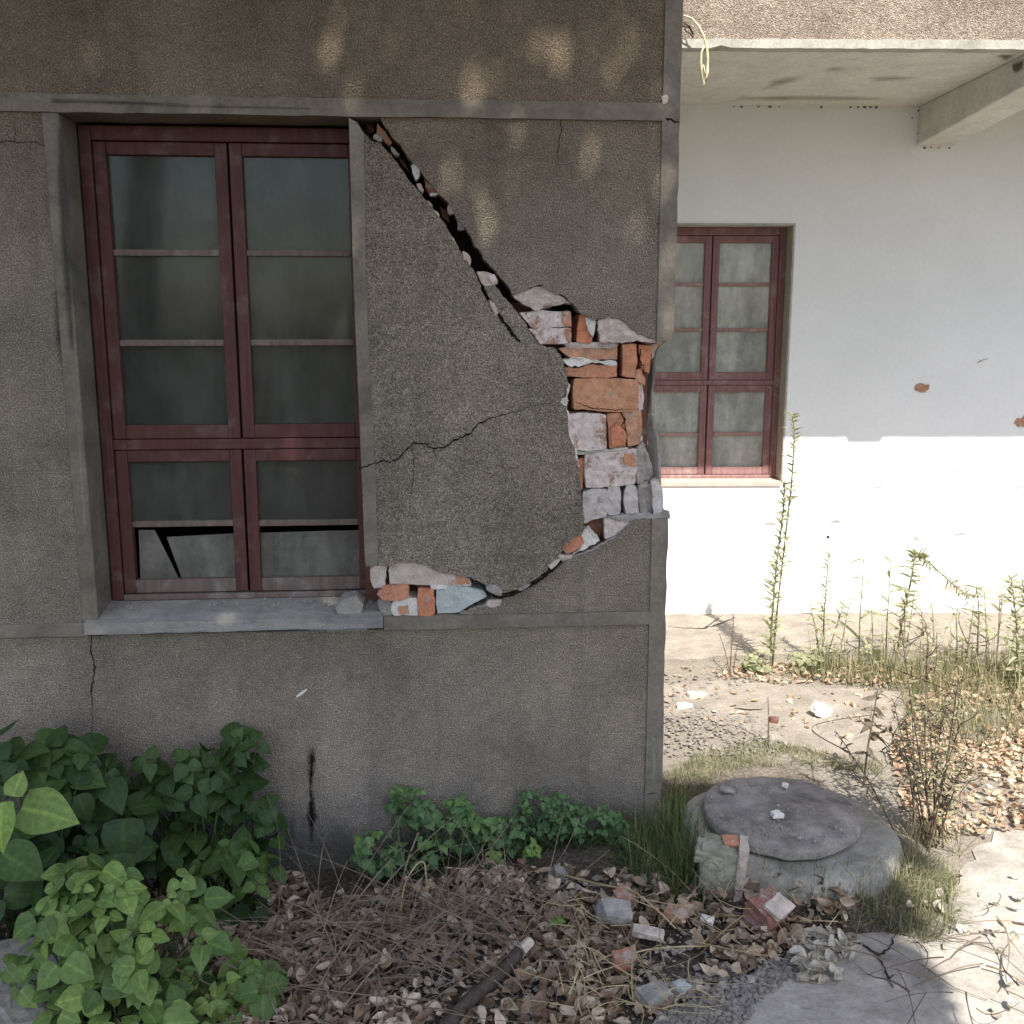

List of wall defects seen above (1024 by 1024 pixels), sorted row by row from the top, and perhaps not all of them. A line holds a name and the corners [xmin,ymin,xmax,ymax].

crack [359,402,553,501]
flaking render [511,286,670,562]
peeling [914,383,929,393]
flaking render [366,562,503,616]
crack [89,636,97,732]
water stain [307,755,317,831]